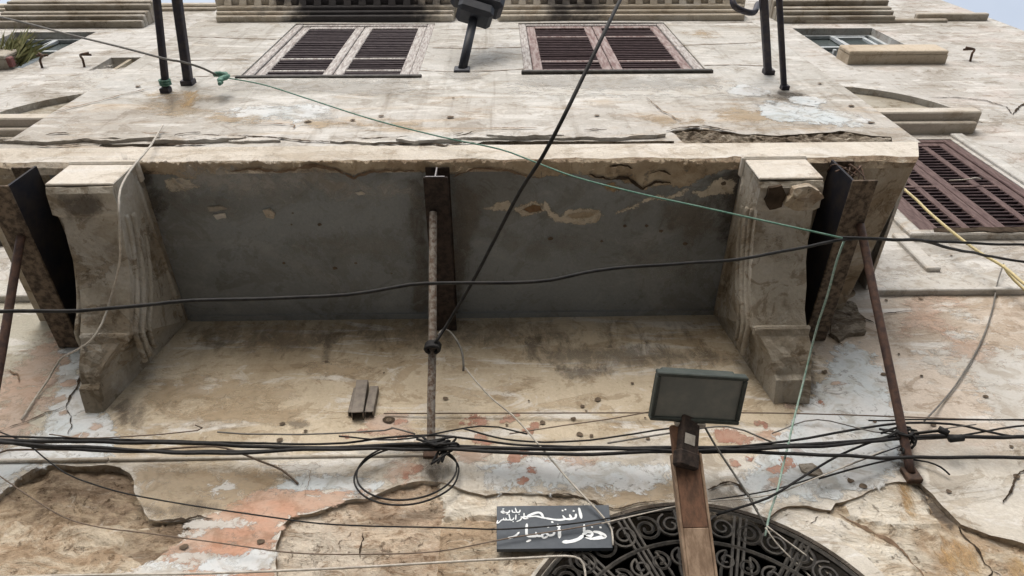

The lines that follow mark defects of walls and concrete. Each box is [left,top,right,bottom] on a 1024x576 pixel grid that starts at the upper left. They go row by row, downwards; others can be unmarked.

peeling [477,80,892,145]
damp [718,107,786,122]
spalling [140,159,740,190]
crack [0,377,81,432]
spalling [713,269,1024,576]
spalling [0,333,672,576]
crack [1003,470,1024,502]
crack [958,527,1000,576]